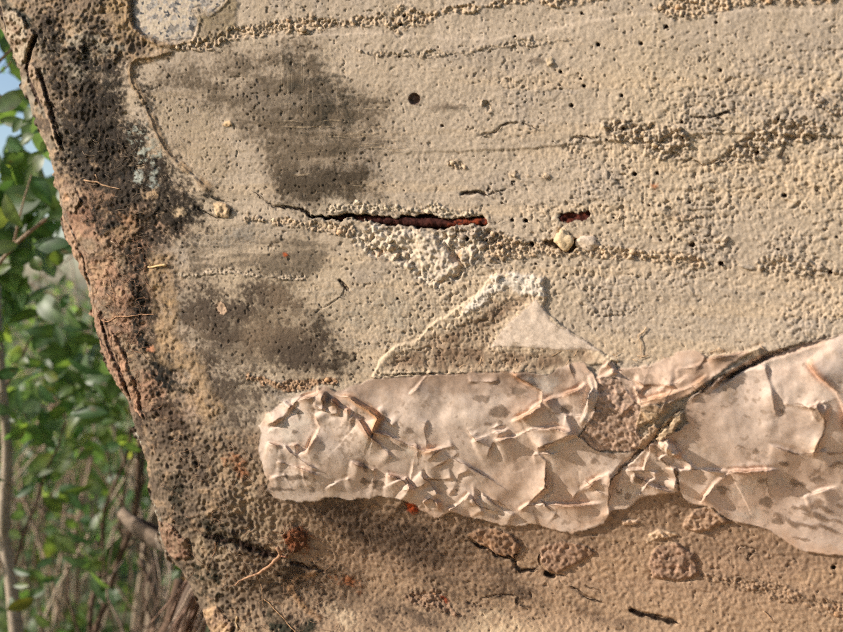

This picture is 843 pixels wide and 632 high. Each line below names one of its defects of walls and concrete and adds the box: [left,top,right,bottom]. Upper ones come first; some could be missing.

leakage [107,0,134,29]
crack [460,180,516,196]
leakage [34,18,388,428]
crack [193,197,234,219]
crack [254,192,500,230]
rust [334,215,488,228]
peeling [371,272,618,379]
peeling [646,507,731,543]